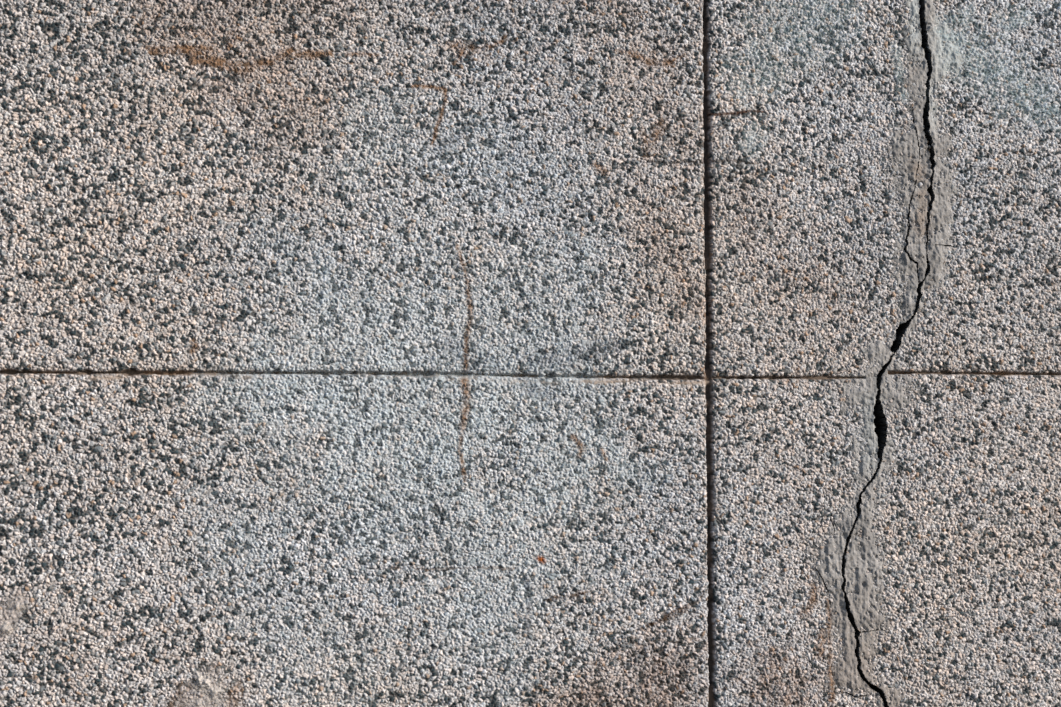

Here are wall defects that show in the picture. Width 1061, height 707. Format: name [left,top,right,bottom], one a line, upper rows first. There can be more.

water stain [0,595,27,634]
crack [815,0,954,707]